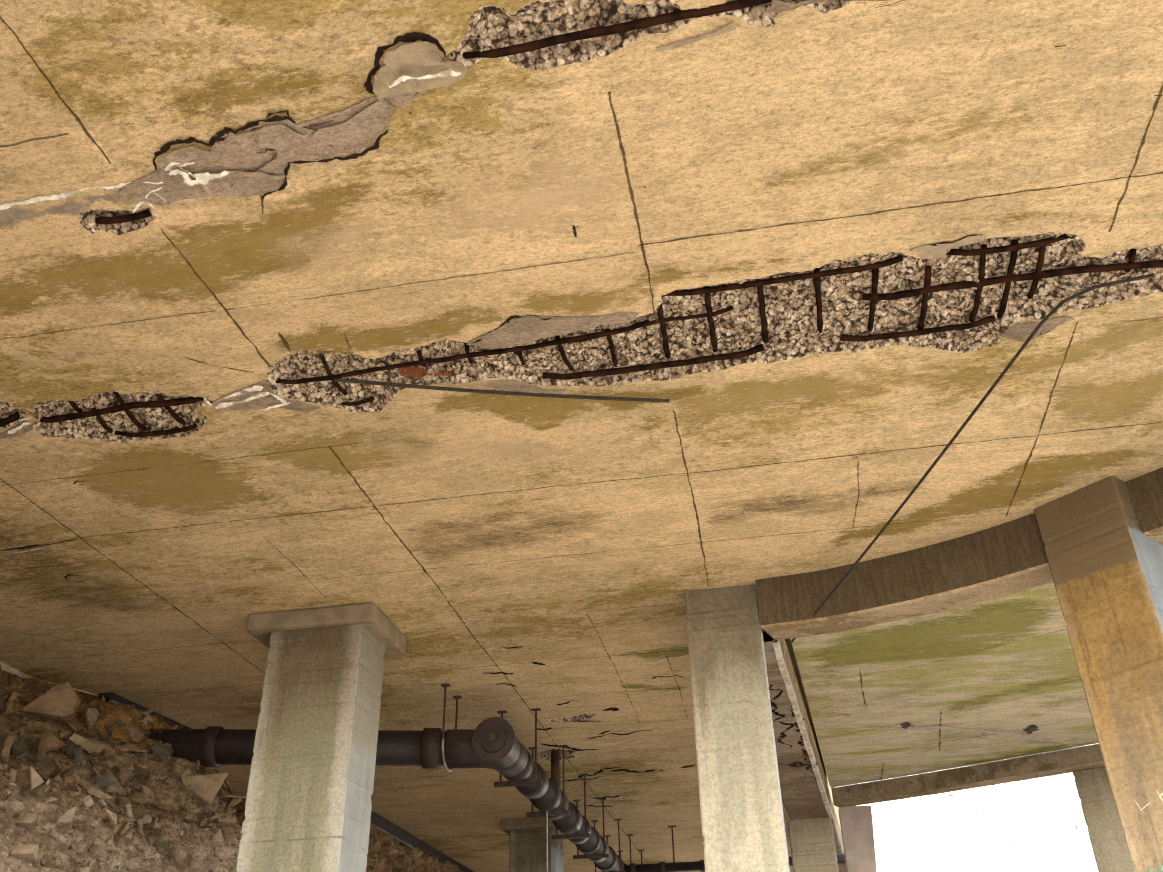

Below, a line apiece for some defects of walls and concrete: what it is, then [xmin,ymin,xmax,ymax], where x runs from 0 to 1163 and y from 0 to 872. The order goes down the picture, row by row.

spalling [383,0,850,71]
crack [843,0,905,8]
peeling [80,92,419,236]
water stain [0,181,373,317]
spalling [0,232,1163,443]
water stain [77,450,269,514]
crack [769,685,818,783]